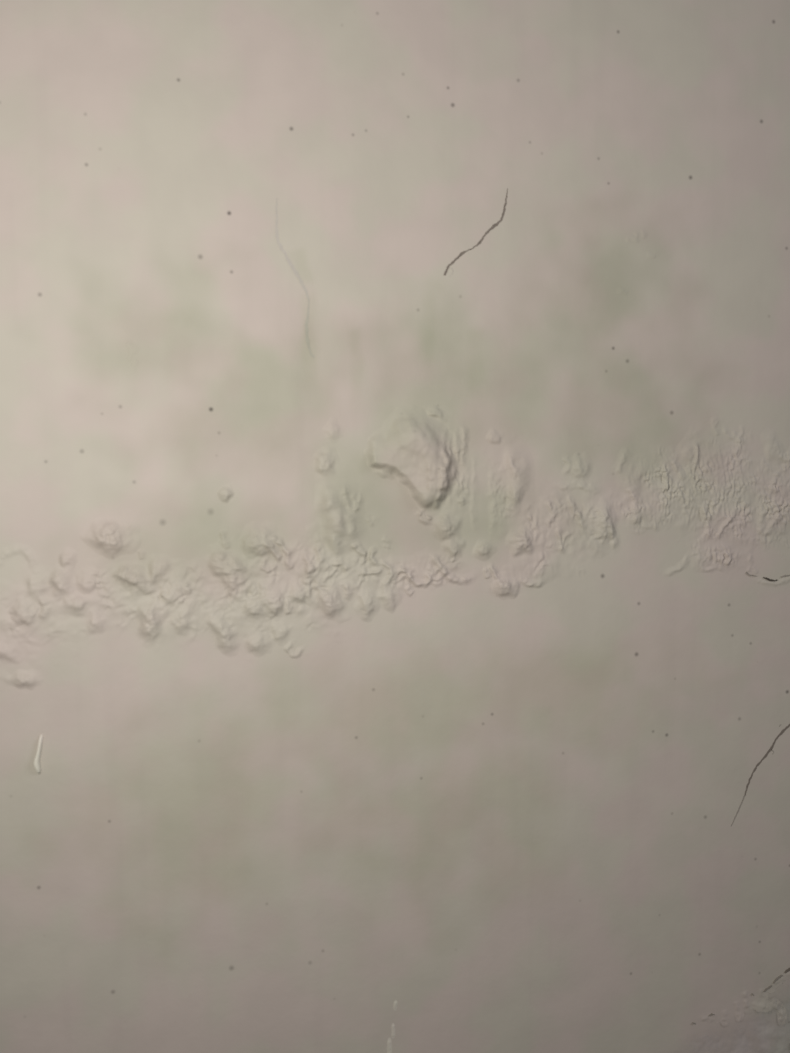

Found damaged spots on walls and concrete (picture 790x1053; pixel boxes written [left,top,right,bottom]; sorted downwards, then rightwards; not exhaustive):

crack [444,188,508,276]
crack [731,724,790,826]